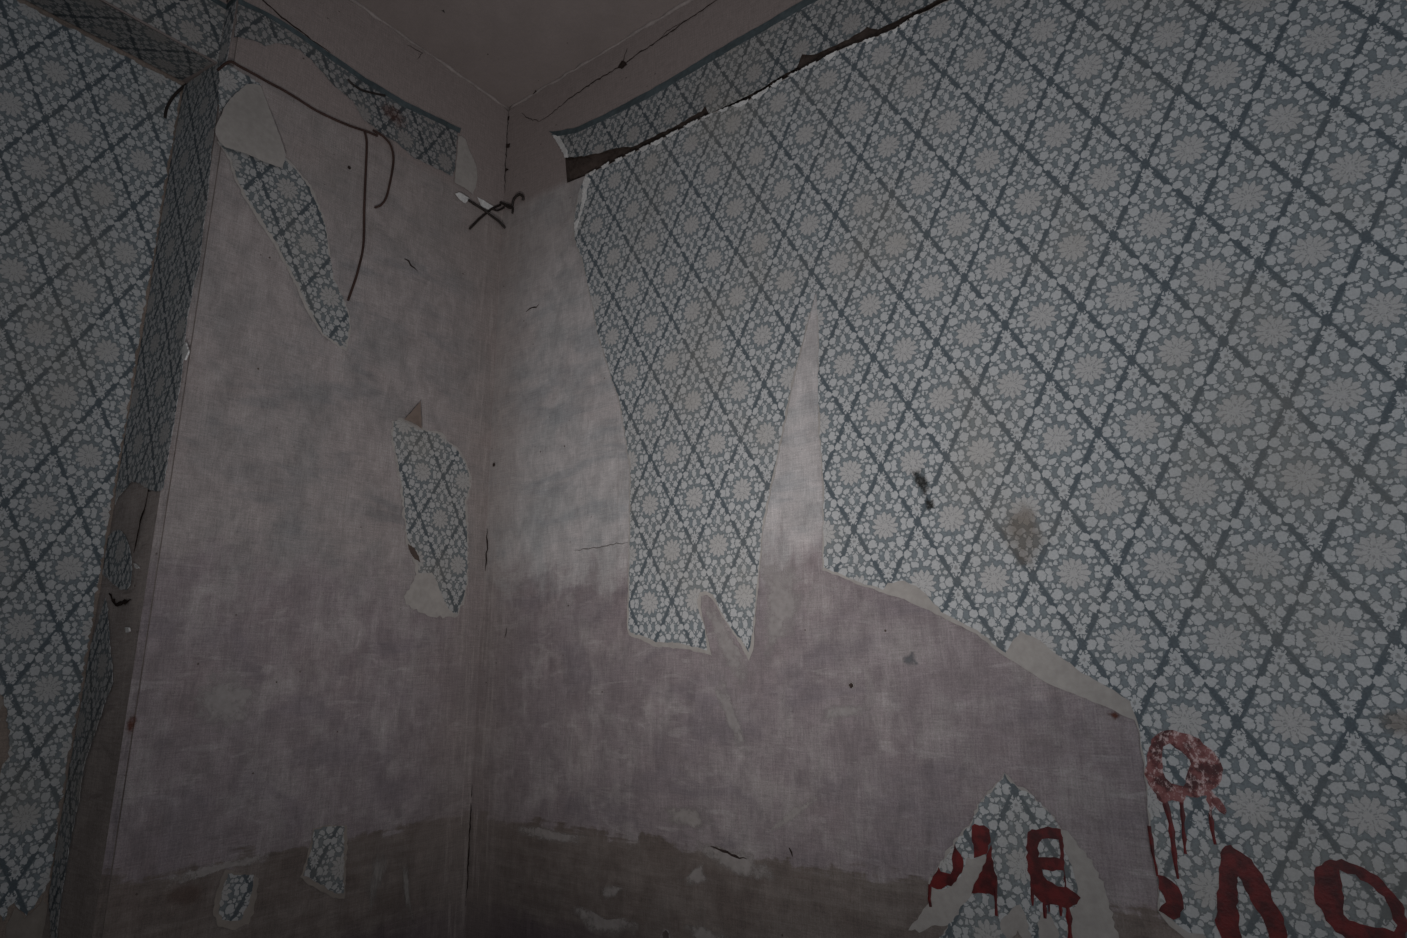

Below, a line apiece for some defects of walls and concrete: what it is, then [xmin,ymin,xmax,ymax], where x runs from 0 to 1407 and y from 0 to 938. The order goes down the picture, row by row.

crack [504,0,717,187]
water stain [913,472,933,509]